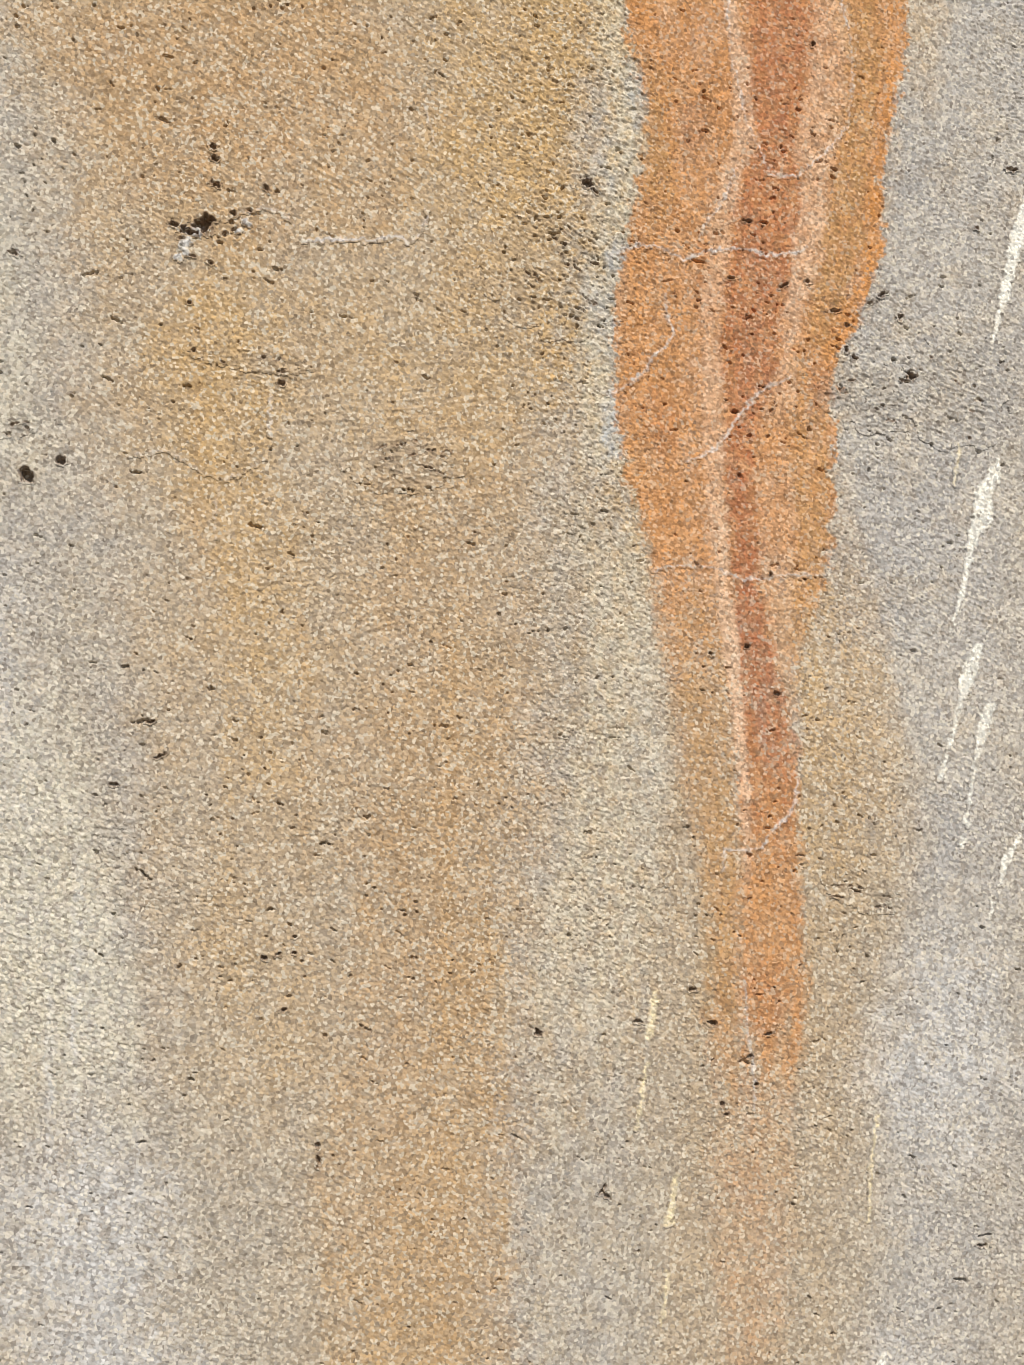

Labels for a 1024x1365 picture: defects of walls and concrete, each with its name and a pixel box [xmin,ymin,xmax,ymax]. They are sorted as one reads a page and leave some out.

corrosion [602,0,954,1365]